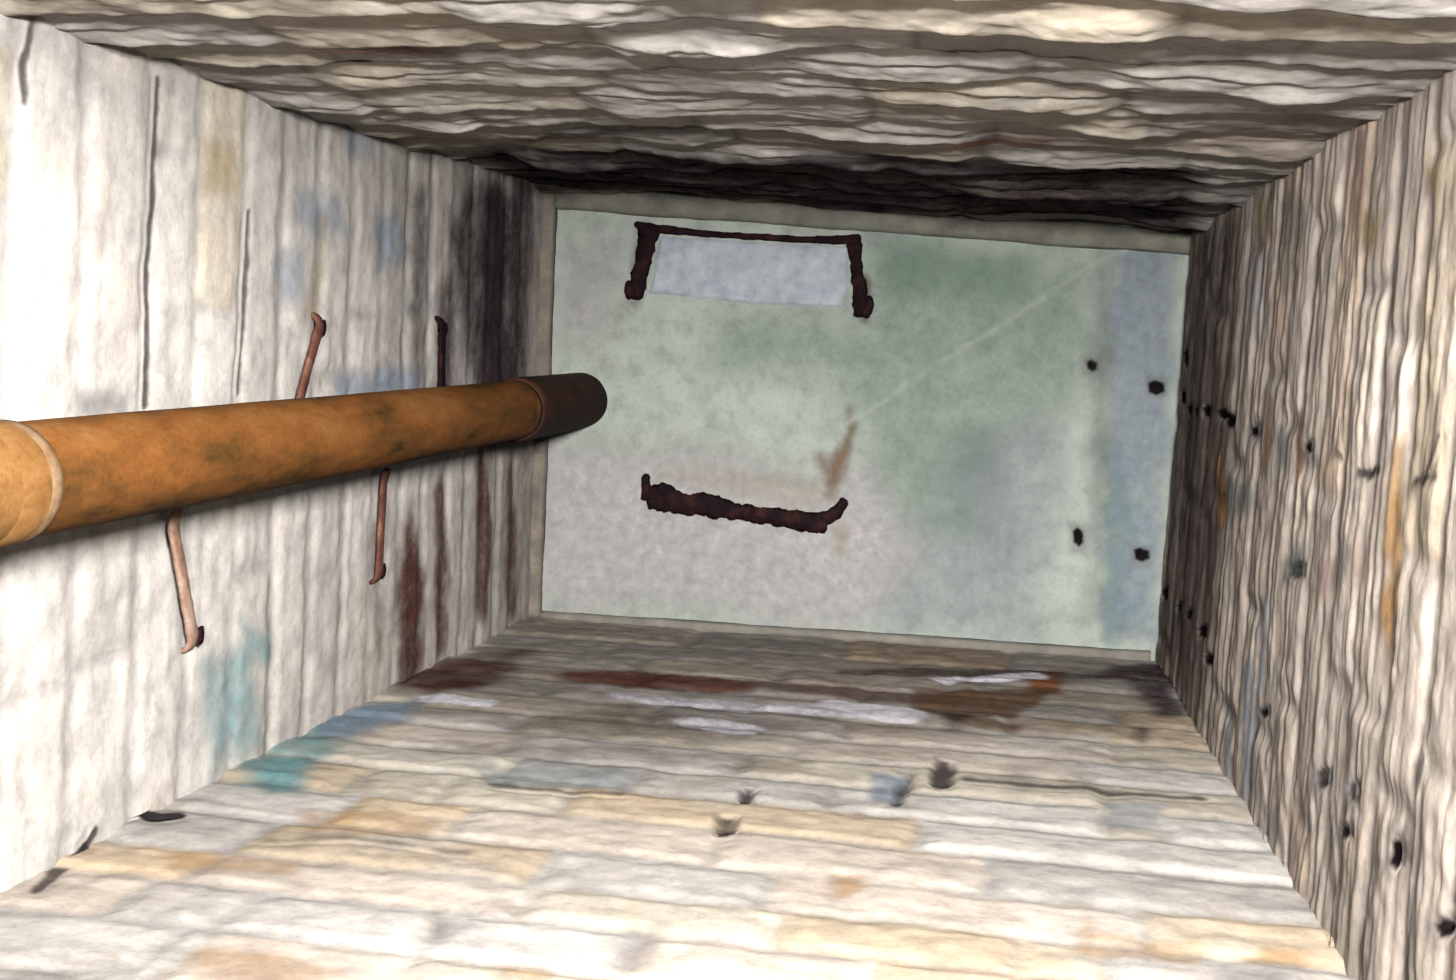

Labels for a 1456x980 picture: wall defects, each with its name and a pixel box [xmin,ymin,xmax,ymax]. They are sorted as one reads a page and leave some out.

damp [442,149,1186,386]
corrosion [564,671,752,693]
corrosion [914,671,1061,730]